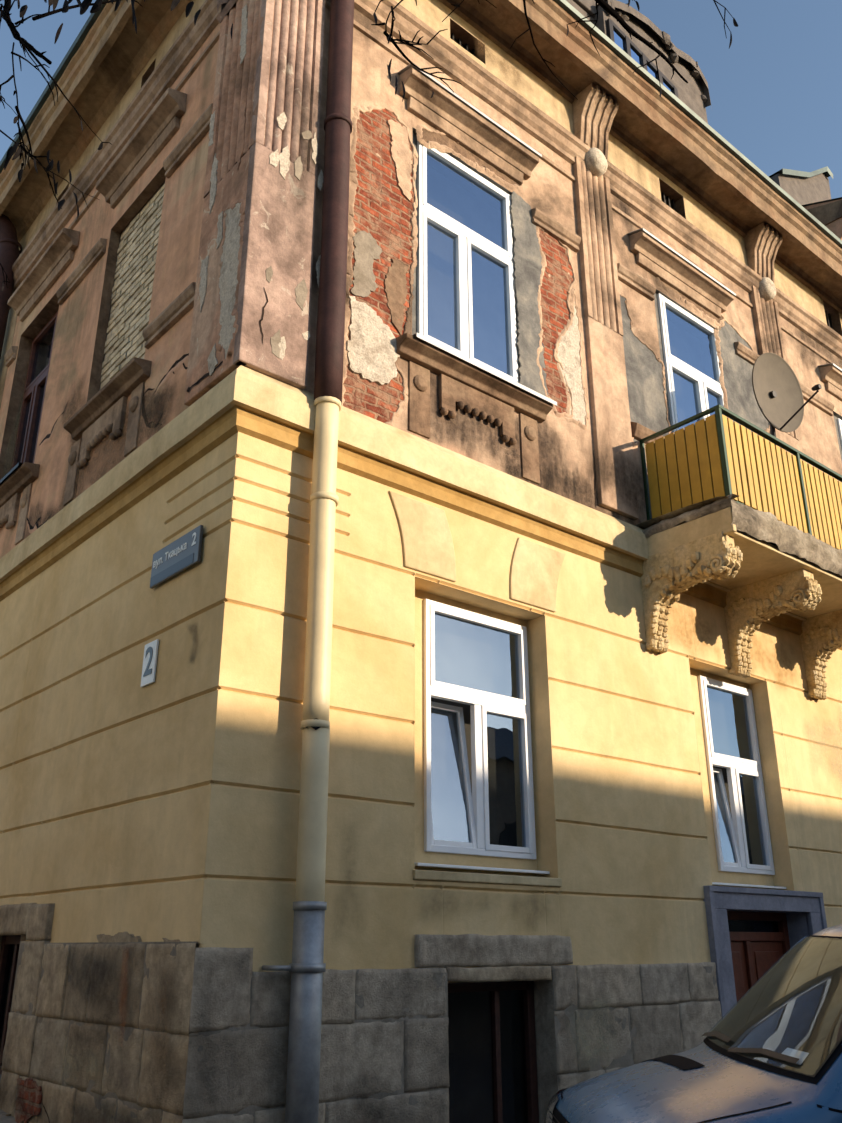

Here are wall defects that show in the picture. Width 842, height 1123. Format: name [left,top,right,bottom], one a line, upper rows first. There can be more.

peeling [240,5,248,64]
peeling [199,111,245,376]
flaking render [342,104,523,427]
flaking render [536,226,577,418]
spalling [15,1077,42,1123]